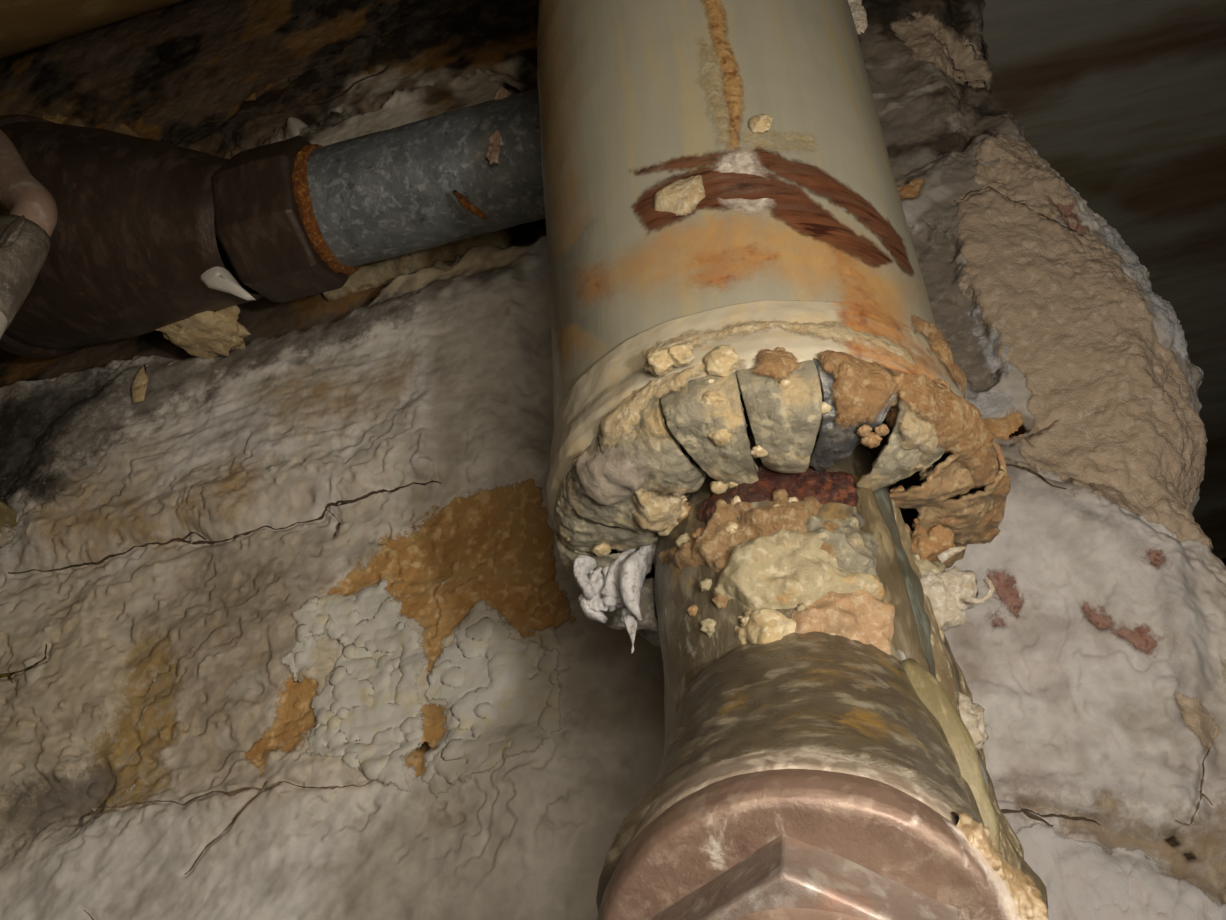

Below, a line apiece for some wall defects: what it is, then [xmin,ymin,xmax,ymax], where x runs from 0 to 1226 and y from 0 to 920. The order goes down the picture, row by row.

rust [704,0,743,150]
rust [292,144,360,276]
crack [8,480,442,574]
rust [696,460,859,525]
crack [0,644,47,683]
peeling [245,479,576,798]
crack [78,780,389,875]
water stain [1063,791,1226,904]